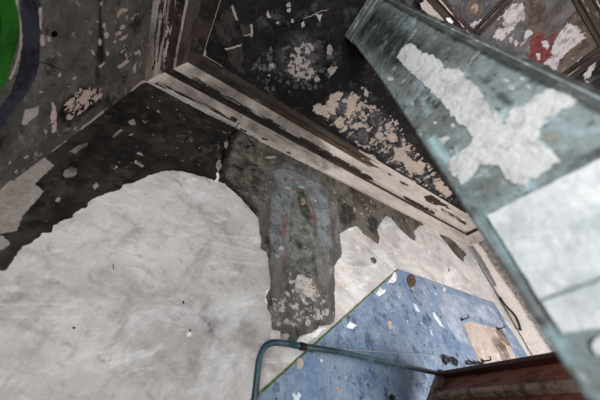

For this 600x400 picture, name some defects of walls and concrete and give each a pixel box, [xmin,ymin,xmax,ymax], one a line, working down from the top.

peeling [420,0,533,47]
peeling [536,22,596,83]
peeling [0,75,424,271]
peeling [298,81,452,214]
peeling [397,43,577,187]
flaking render [270,327,326,343]
flaking render [411,286,516,364]
flaking render [439,234,555,352]